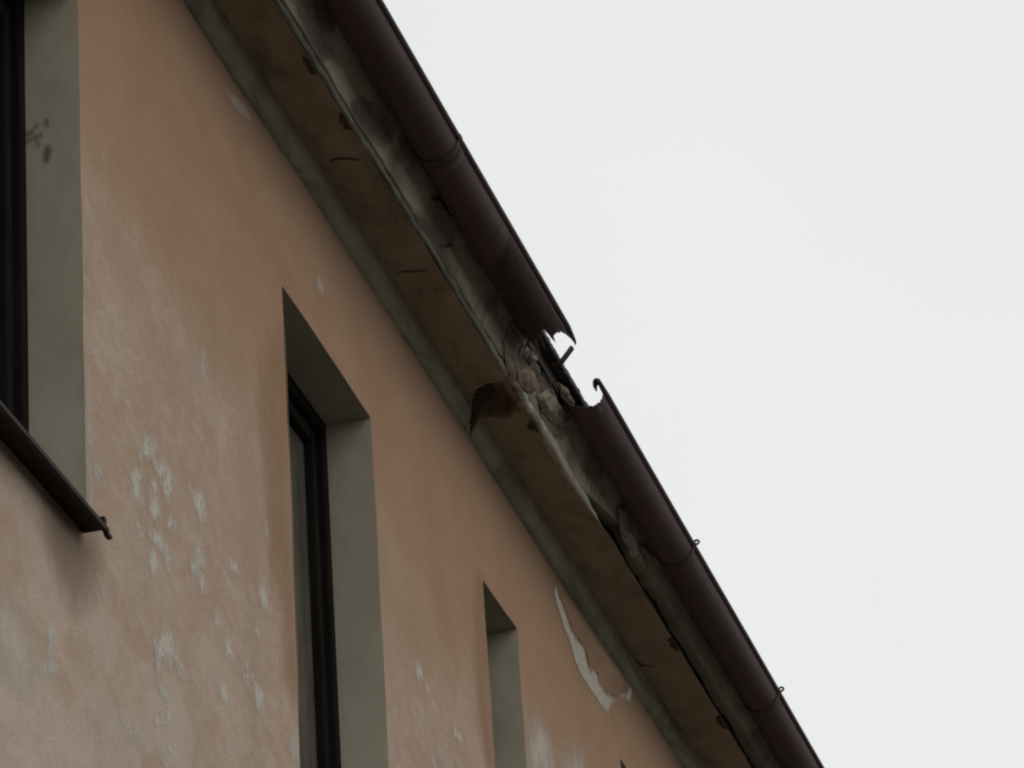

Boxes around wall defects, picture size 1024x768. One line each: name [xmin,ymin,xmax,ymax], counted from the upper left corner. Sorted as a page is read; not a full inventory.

spalling [465,322,575,439]
peeling [131,435,175,576]
flaking render [554,586,632,712]